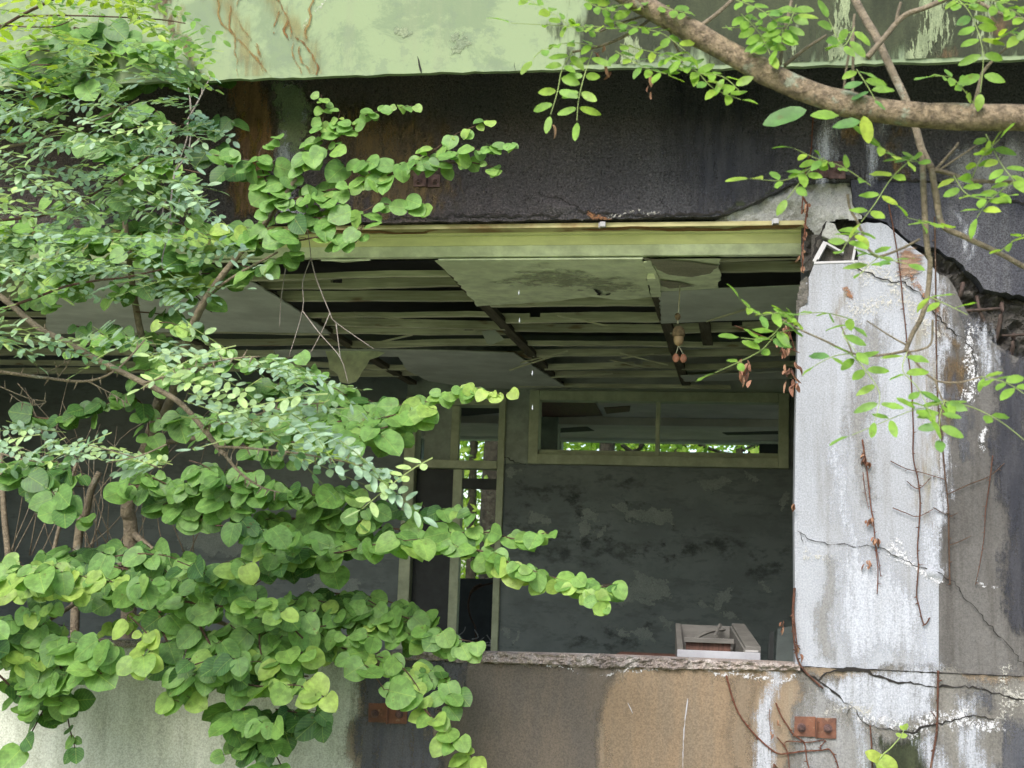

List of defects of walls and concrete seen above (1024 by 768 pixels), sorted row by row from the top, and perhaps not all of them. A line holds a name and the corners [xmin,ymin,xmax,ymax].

corrosion [217,0,277,218]
corrosion [273,0,319,75]
spalling [796,277,809,322]
spalling [920,250,1024,358]
damp [708,257,1024,768]
crack [798,531,1024,734]